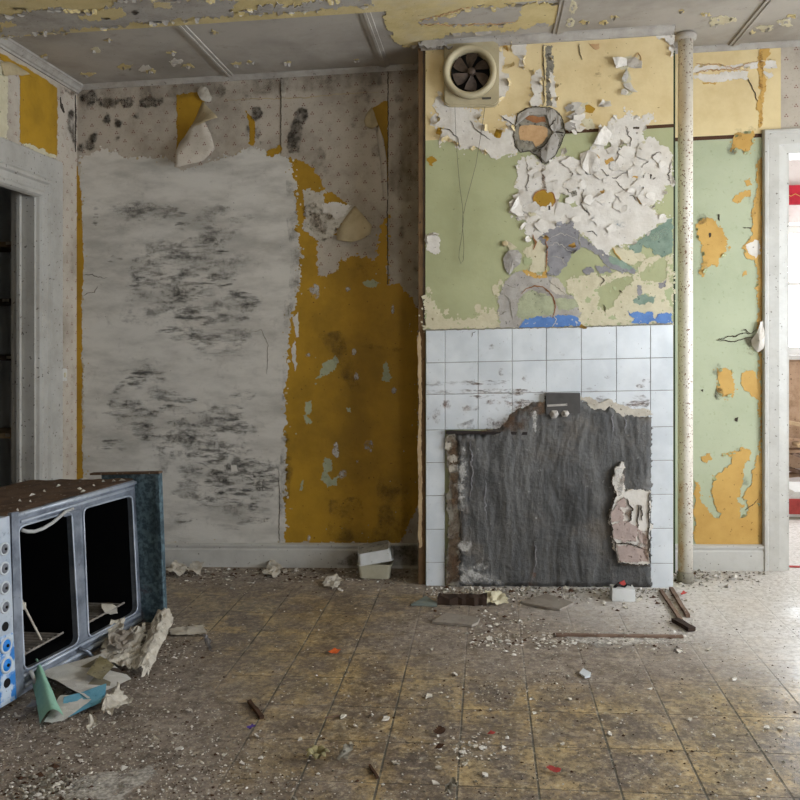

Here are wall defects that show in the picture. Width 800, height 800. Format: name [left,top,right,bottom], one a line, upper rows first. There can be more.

peeling [0,0,374,53]
peeling [382,1,559,50]
peeling [0,53,58,159]
mould [69,110,97,151]
mould [80,91,163,127]
mould [287,108,308,153]
peeling [693,48,777,331]
flaking render [77,42,676,543]
damp [206,470,278,503]
spalling [444,434,462,587]
spalling [608,461,653,566]
peeling [693,350,762,544]